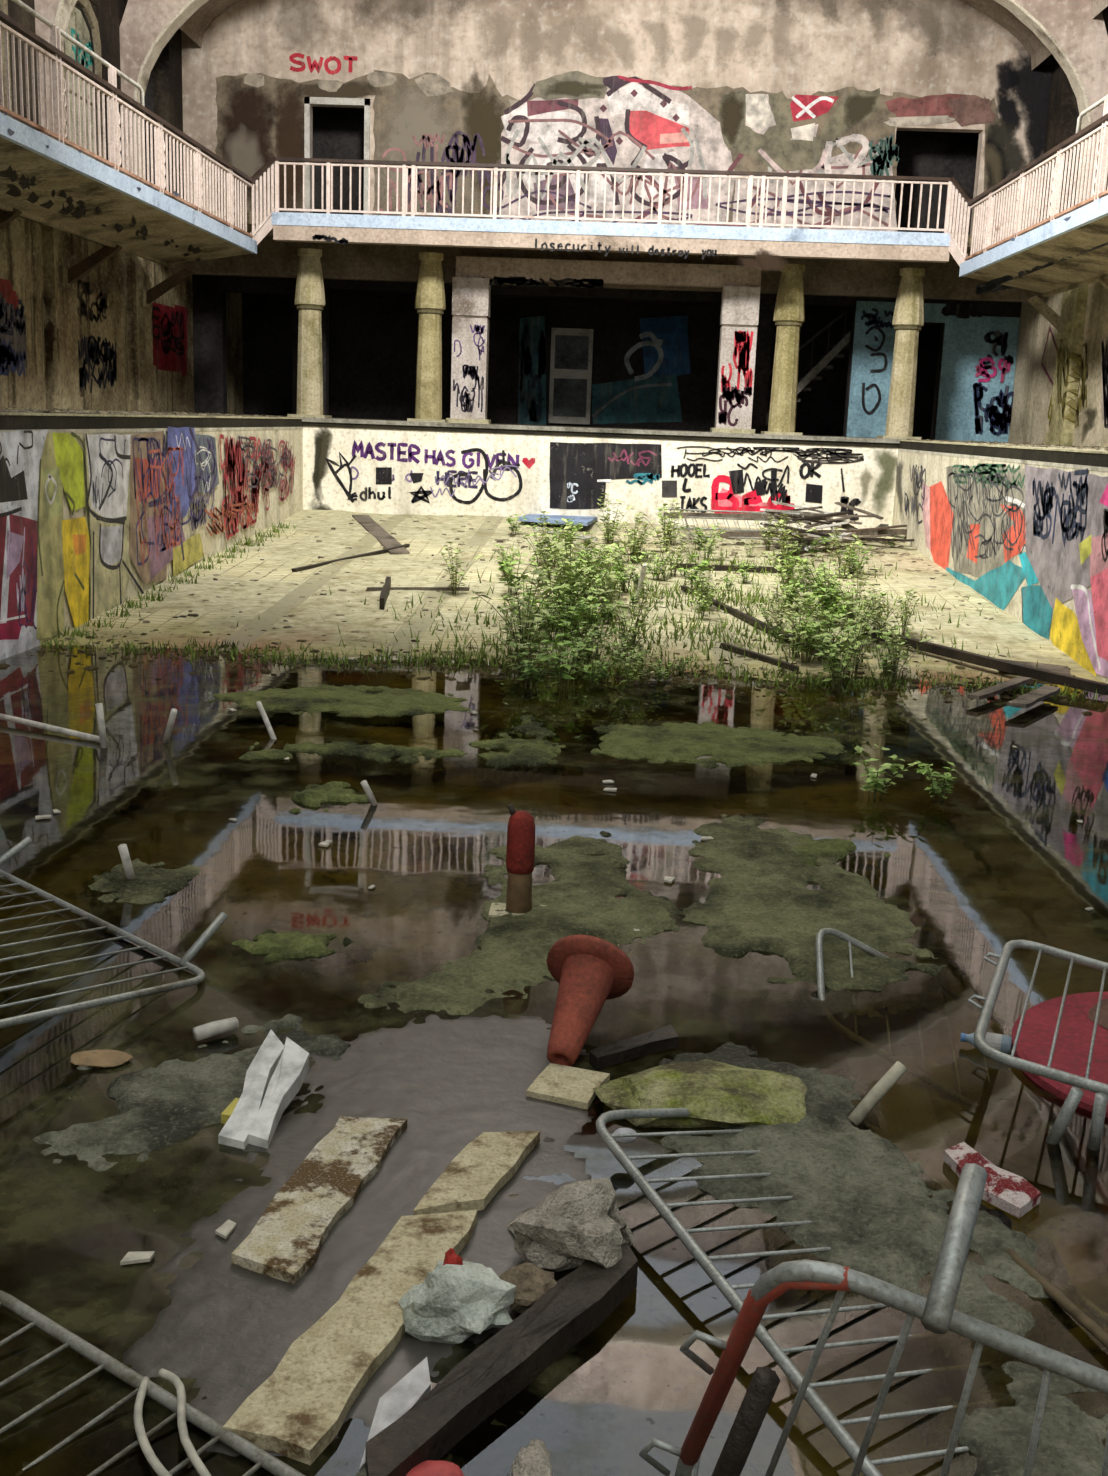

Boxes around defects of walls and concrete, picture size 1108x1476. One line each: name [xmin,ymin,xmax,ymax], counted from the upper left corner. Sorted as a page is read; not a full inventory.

flaking render [215,70,623,219]
water stain [984,54,1054,198]
water stain [1083,410,1096,437]